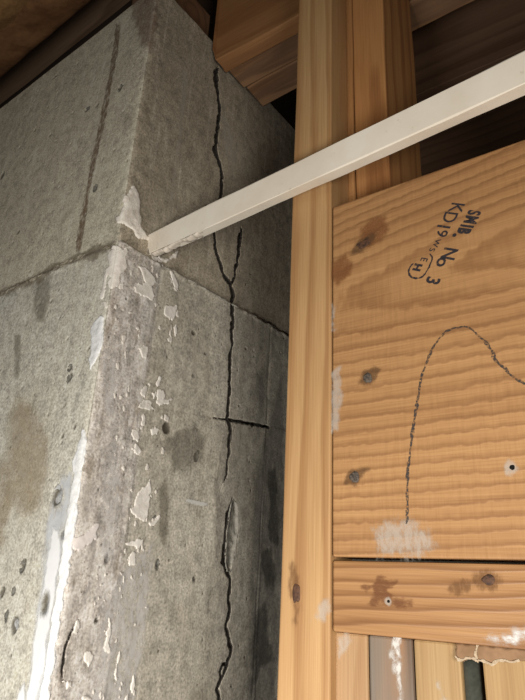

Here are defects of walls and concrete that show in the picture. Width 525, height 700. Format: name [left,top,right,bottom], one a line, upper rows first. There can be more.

crack [205,68,224,206]
damp [88,315,115,414]
flaking render [100,245,179,343]
flaking render [136,326,148,359]
crack [213,228,269,481]
flaking render [114,376,173,455]
damp [17,429,87,700]
crack [215,499,233,700]
crack [61,628,74,681]